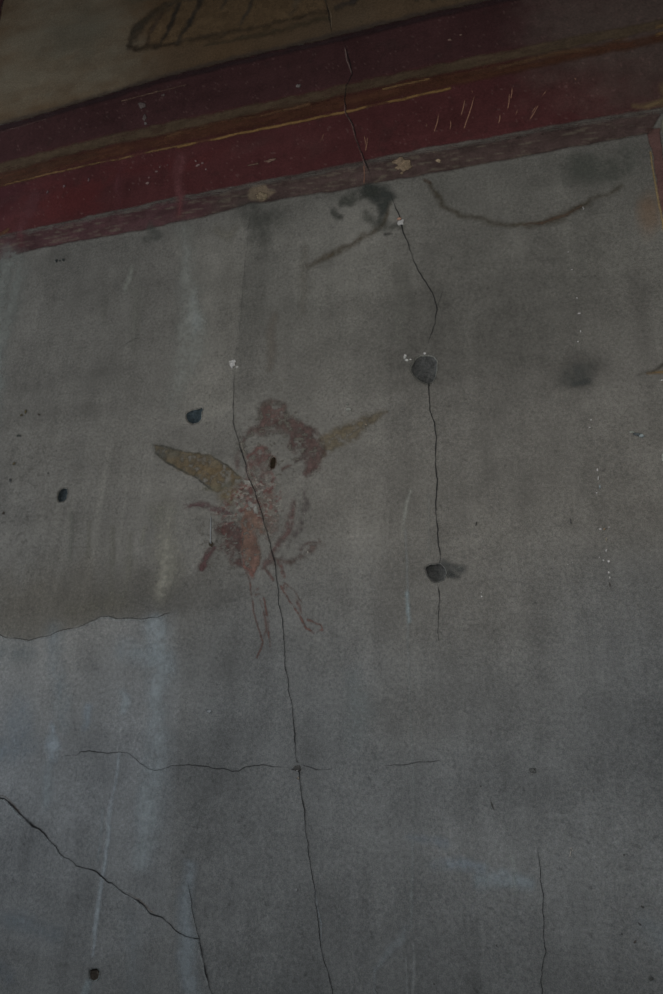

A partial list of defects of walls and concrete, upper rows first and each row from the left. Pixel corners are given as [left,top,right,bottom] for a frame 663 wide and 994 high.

crack [428,384,441,555]
crack [182,764,273,772]
crack [233,400,333,994]
crack [0,798,210,989]
crack [538,862,546,994]